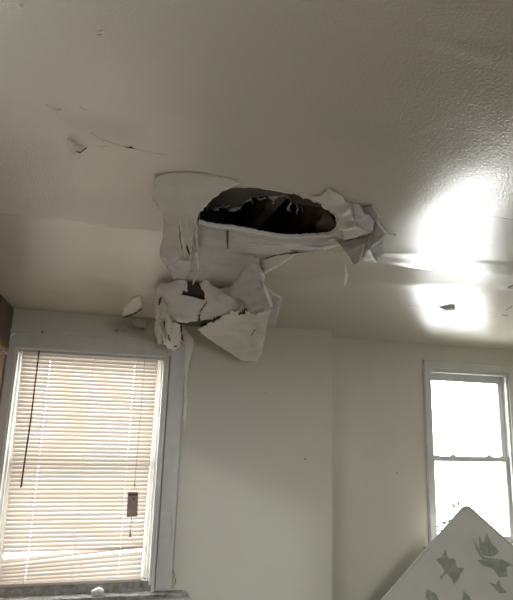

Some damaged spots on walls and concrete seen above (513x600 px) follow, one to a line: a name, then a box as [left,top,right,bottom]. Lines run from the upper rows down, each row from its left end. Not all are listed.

peeling [122,294,143,318]
flaking render [152,172,396,430]